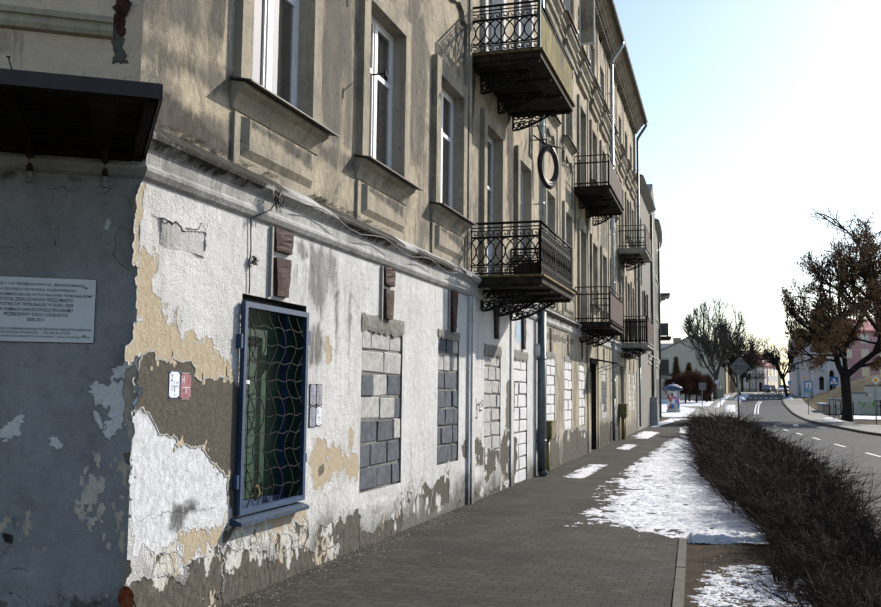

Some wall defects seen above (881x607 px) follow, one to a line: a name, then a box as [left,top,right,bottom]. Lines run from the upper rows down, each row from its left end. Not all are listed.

spalling [111,0,133,64]
water stain [144,0,226,38]
water stain [143,42,227,92]
water stain [407,0,431,164]
water stain [155,92,231,160]
peeling [74,181,518,607]
peeling [0,413,27,443]